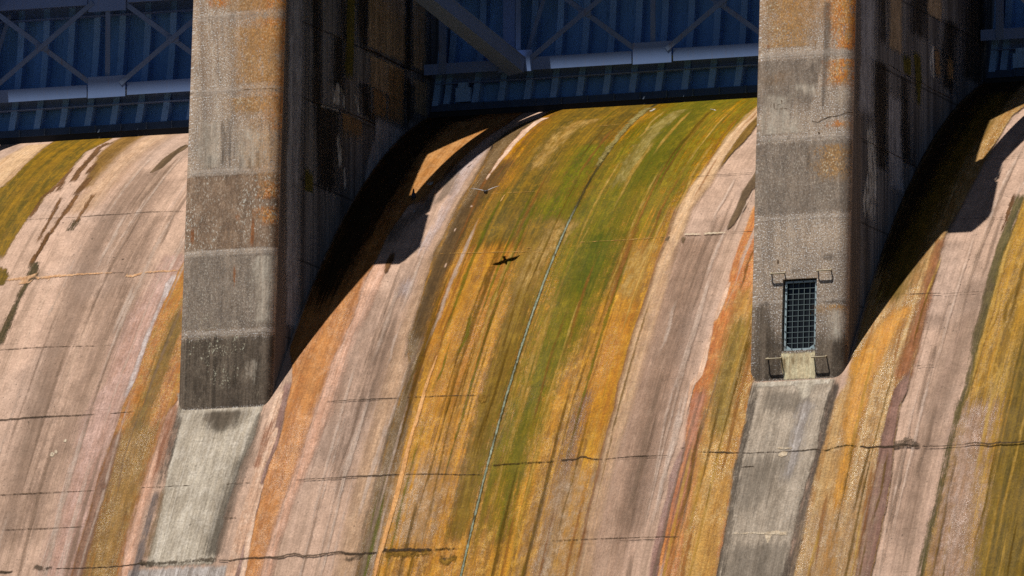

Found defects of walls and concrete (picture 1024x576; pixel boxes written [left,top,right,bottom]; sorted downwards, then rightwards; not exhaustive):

leakage [531,119,598,170]
leakage [517,221,574,288]
leakage [580,95,800,576]
leakage [122,382,291,576]
crack [297,436,1024,480]
crack [0,547,454,573]